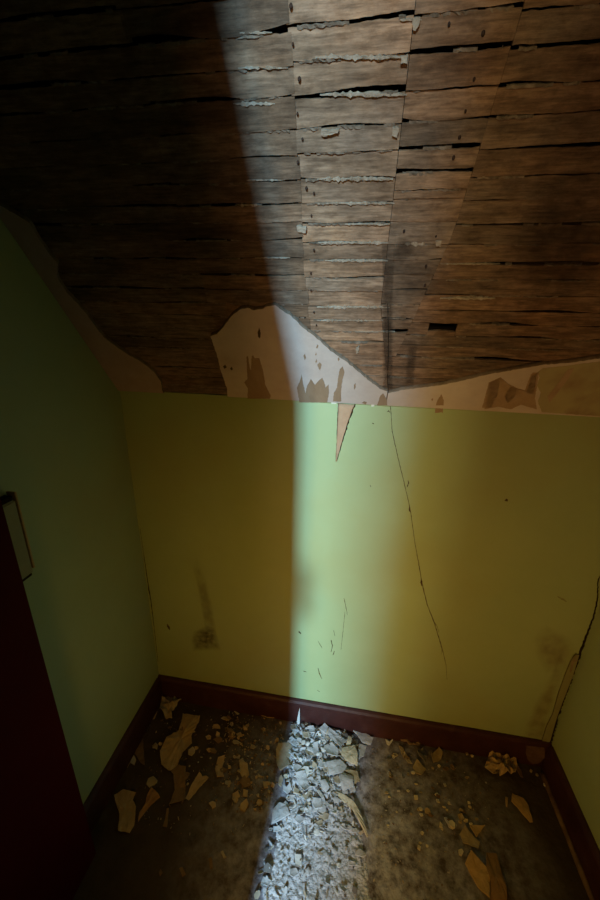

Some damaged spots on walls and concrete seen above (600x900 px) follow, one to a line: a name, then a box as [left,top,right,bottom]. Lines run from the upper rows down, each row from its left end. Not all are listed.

peeling [244,356,271,399]
peeling [297,345,387,461]
peeling [482,372,539,409]
crack [387,407,447,675]
crack [542,576,600,743]